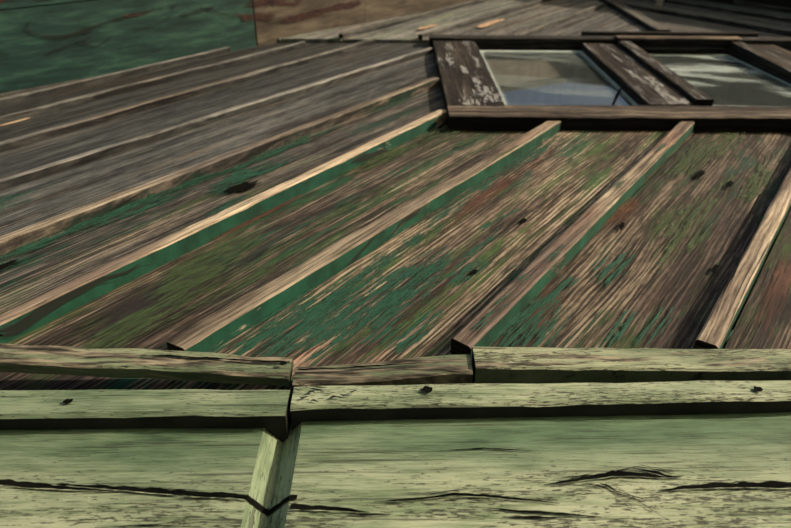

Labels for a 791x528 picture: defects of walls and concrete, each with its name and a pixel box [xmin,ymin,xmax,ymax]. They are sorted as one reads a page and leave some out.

peeling [445,43,504,105]
peeling [81,184,393,349]
peeling [209,134,564,366]
crack [95,520,206,528]
crack [0,464,791,526]